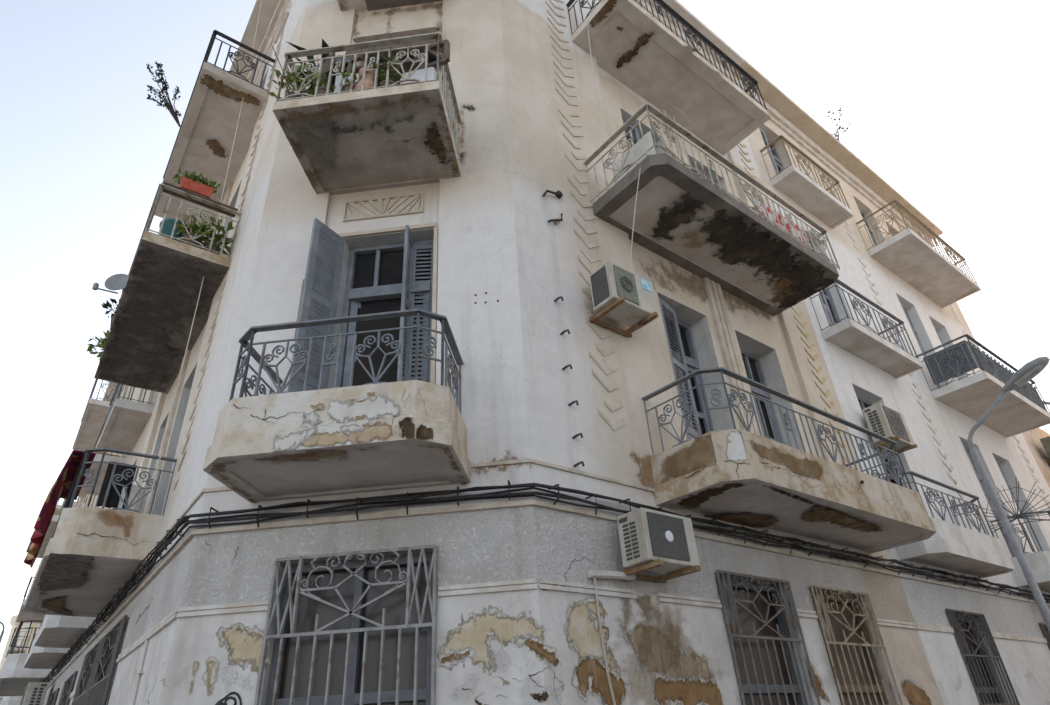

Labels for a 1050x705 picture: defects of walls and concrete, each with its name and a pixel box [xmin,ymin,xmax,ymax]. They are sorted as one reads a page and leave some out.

spalling [200,74,260,106]
peeling [203,139,228,159]
water stain [280,94,464,188]
water stain [647,192,834,318]
water stain [99,244,221,390]
peeling [271,392,434,451]
spalling [678,483,779,528]
spalling [763,485,883,533]
peeling [189,622,270,696]
peeling [437,596,629,705]
peeling [623,618,724,705]
peeling [901,676,933,705]